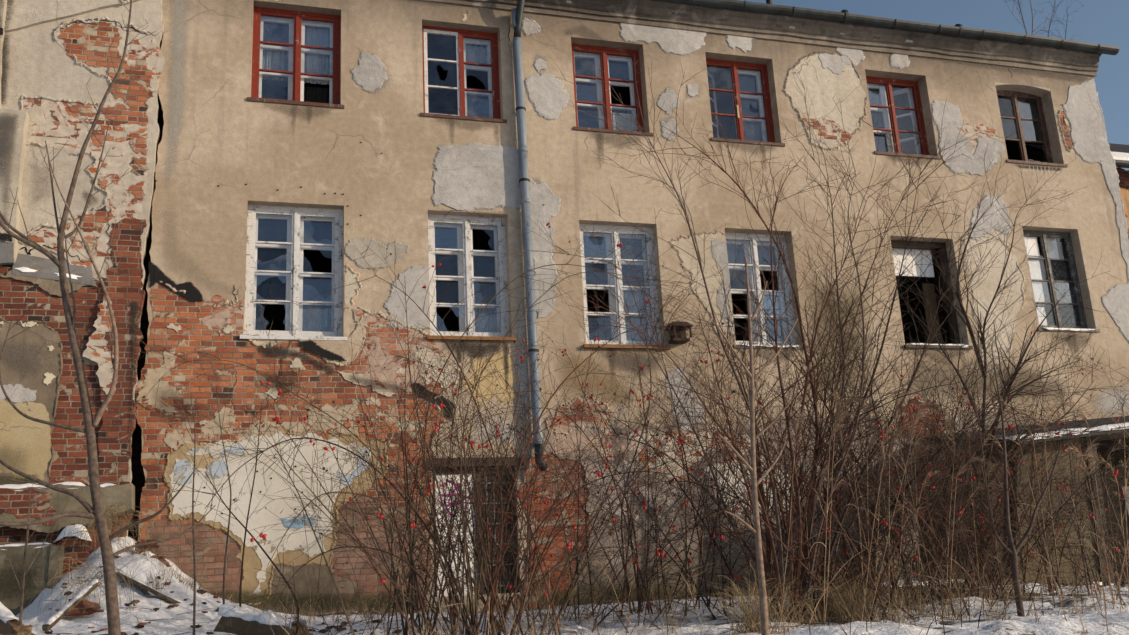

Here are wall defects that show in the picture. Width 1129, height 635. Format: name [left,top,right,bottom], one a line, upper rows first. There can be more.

water stain [0,0,15,197]
flaking render [782,50,868,151]
flaking render [959,123,998,155]
spalling [1056,110,1076,152]
flaking render [1116,167,1129,238]
flaking render [18,16,516,615]
flaking render [668,229,734,337]
flaking render [963,228,1025,382]
flaking render [0,318,63,525]
flaking render [516,394,1129,611]